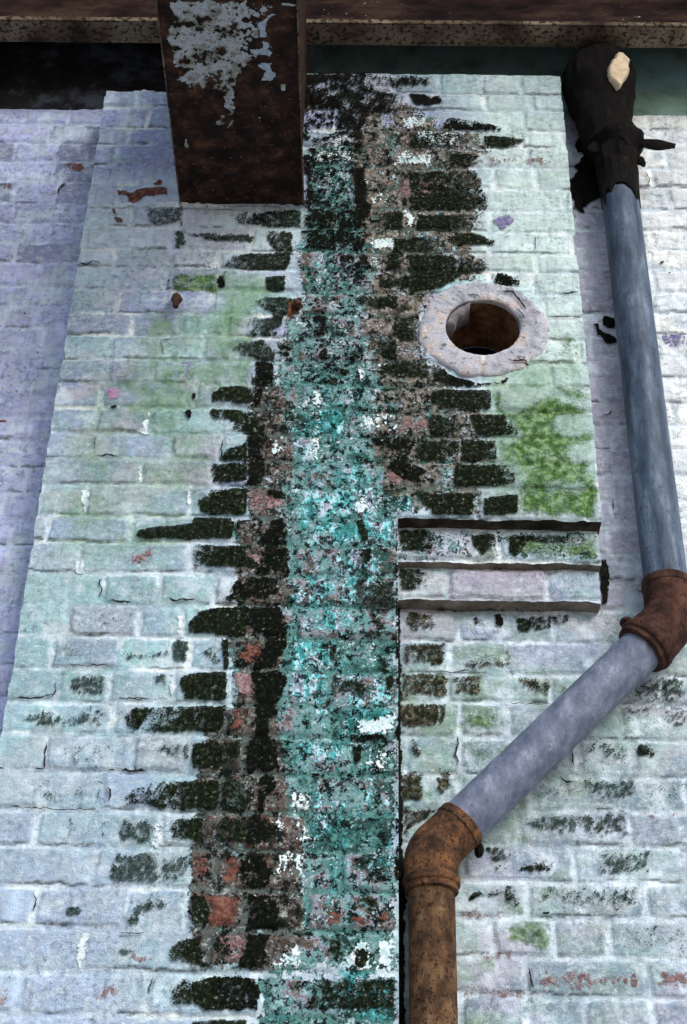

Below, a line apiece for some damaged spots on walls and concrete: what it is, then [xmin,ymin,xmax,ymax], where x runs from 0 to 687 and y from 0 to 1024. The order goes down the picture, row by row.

peeling [384,469,415,486]
peeling [248,491,283,511]
water stain [60,72,598,1024]
water stain [21,675,119,771]
peeling [326,911,365,929]